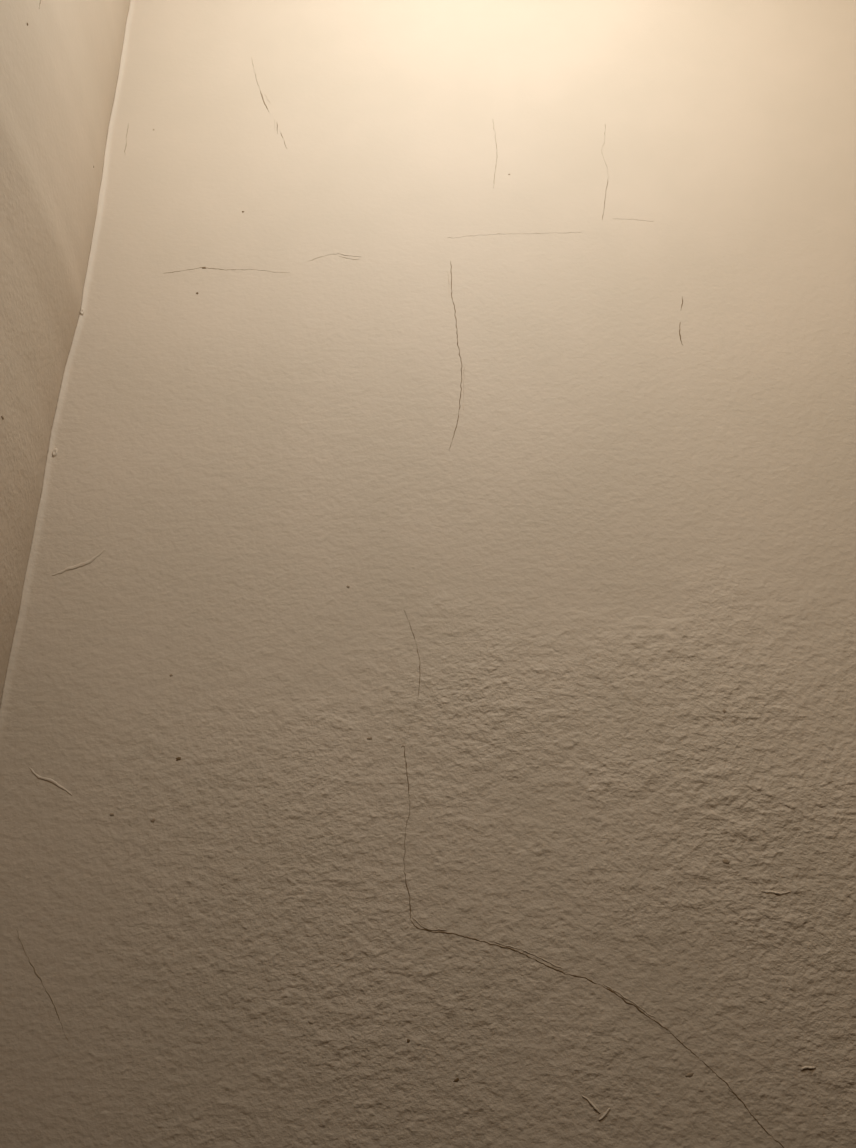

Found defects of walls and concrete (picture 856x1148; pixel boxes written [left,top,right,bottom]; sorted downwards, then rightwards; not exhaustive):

crack [448,233,499,450]
crack [403,613,784,1148]